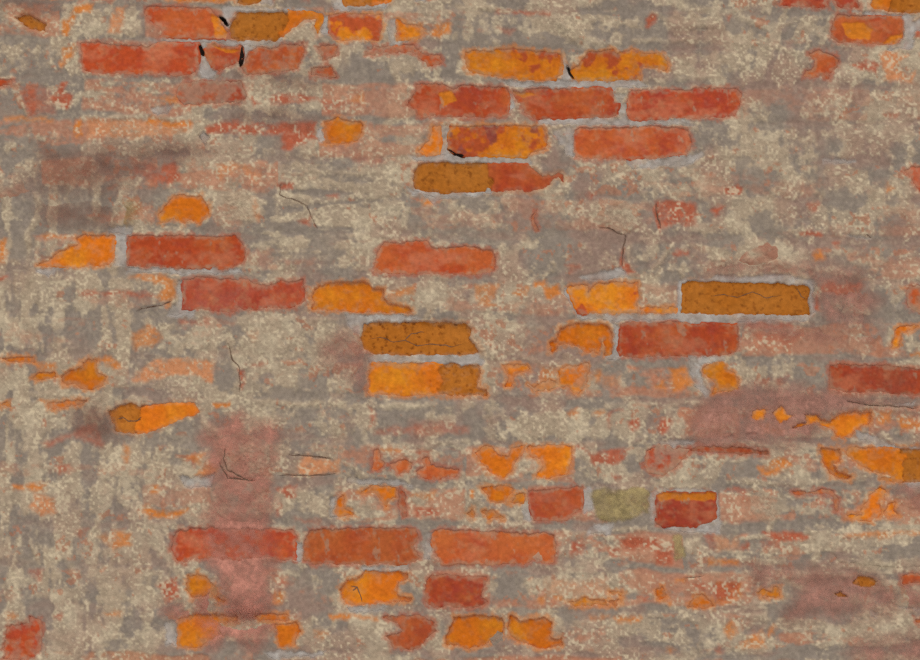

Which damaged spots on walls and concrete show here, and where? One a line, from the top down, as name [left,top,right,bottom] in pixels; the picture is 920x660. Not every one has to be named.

peeling [81,0,443,79]
peeling [779,0,920,45]
spalling [408,48,742,194]
peeling [33,235,496,397]
peeling [550,281,810,395]
spalling [109,402,200,434]
peeling [829,363,920,396]
peeling [171,485,419,605]
peeling [467,444,584,522]
peeling [654,490,718,529]
spalling [820,446,920,522]
peeling [424,529,562,649]